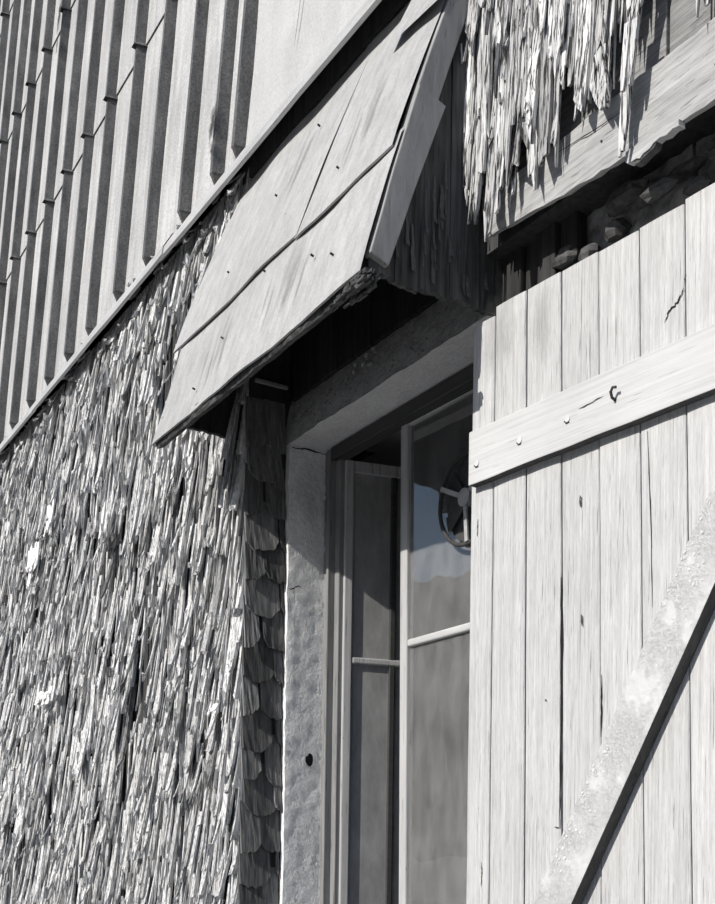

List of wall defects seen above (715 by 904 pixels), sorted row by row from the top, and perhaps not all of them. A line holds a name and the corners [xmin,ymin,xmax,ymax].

crack [665,275,686,320]